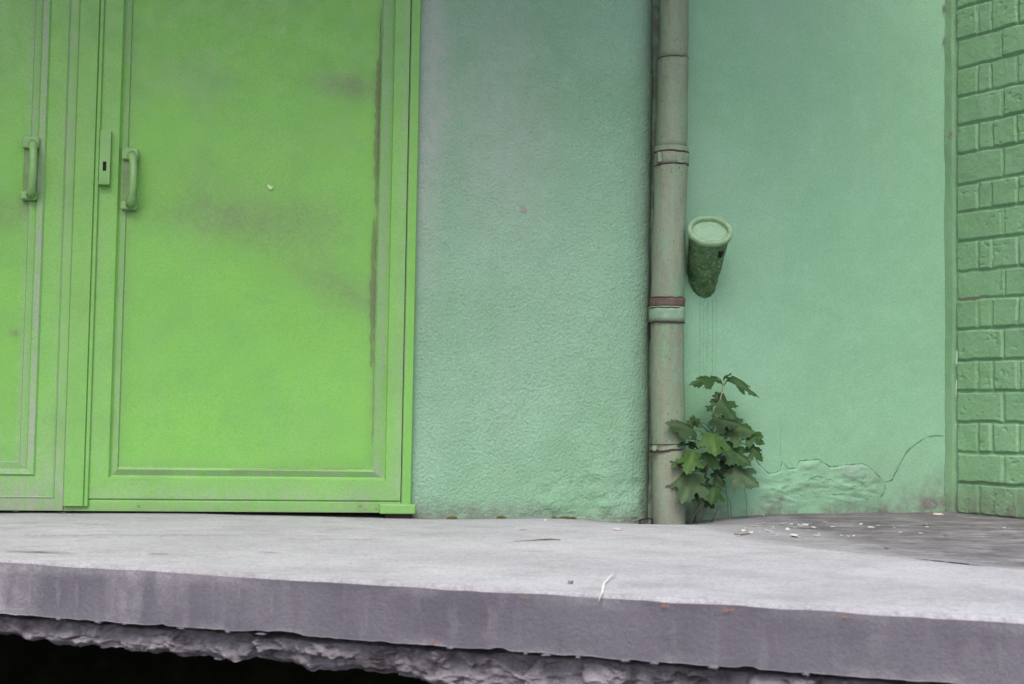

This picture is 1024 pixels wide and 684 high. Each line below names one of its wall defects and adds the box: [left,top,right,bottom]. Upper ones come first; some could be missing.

crack [756,432,943,499]